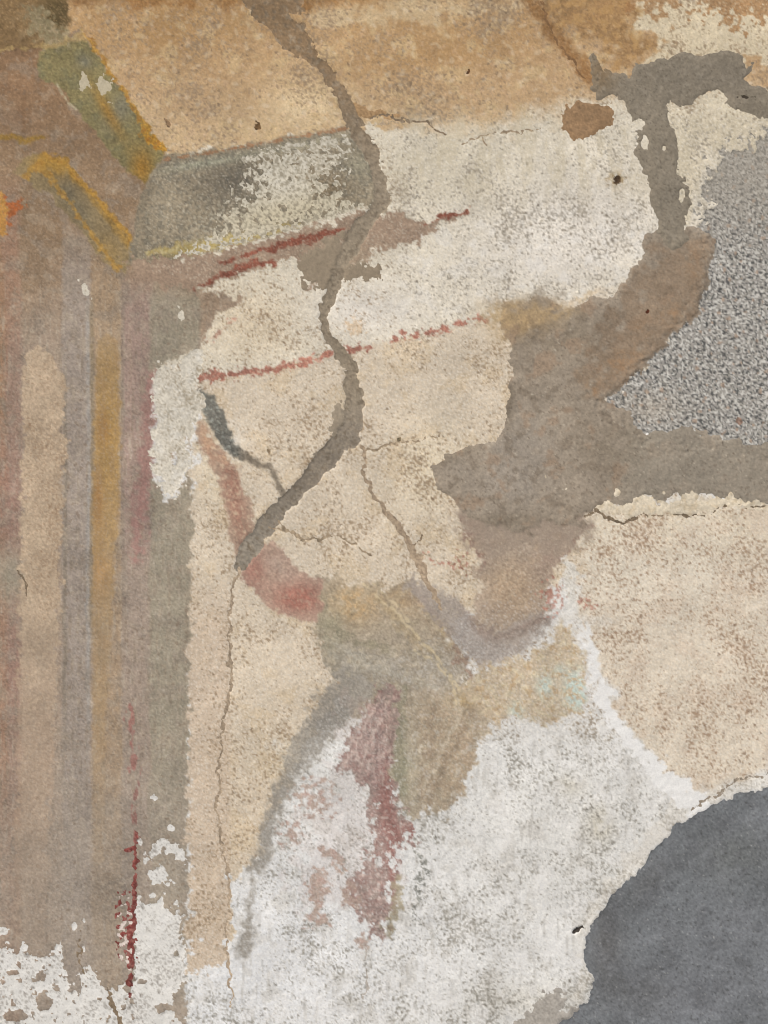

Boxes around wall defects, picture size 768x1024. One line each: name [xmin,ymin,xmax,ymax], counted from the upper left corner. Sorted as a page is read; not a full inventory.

leakage [542,0,768,76]
spalling [607,125,768,446]
crack [214,0,541,1008]
crack [584,504,765,525]